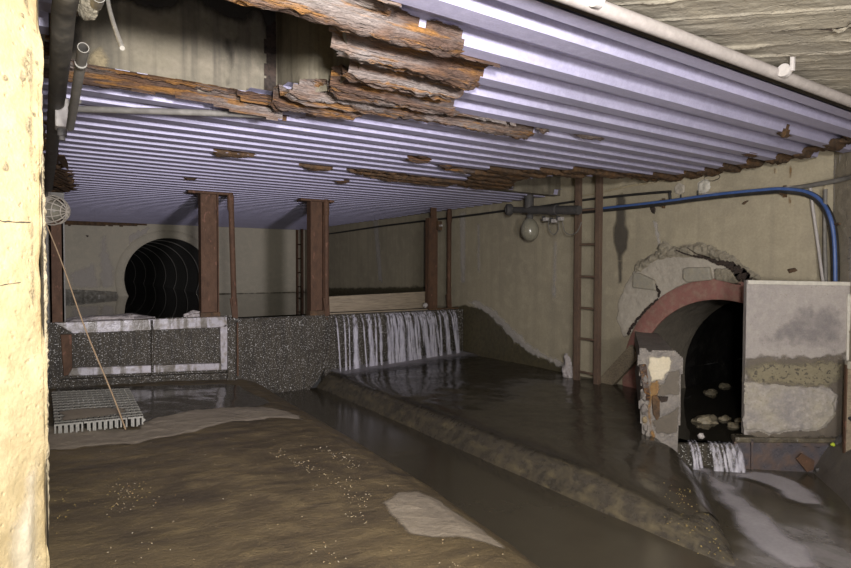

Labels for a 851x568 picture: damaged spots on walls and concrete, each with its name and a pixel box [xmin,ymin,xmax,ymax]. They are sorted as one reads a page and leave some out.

spalling [77,0,100,21]
spalling [88,50,107,67]
corrosion [776,124,791,138]
corrosion [299,163,334,171]
corrosion [335,136,851,190]
spalling [634,241,761,282]
water stain [41,140,50,553]